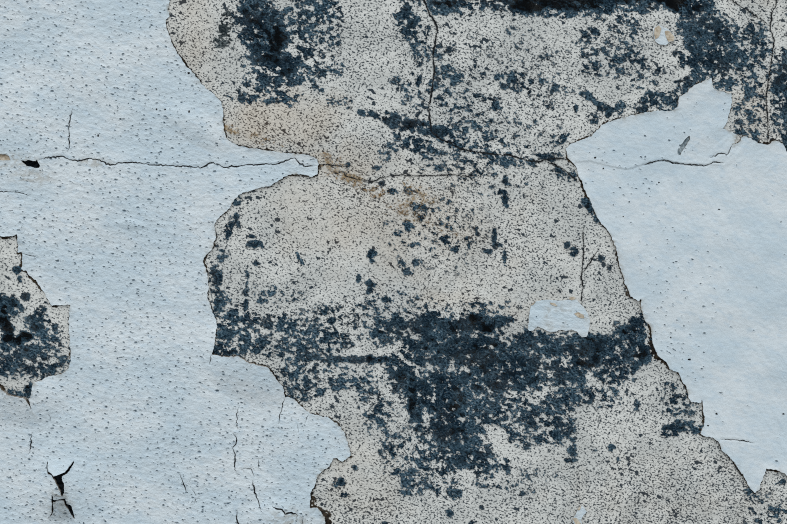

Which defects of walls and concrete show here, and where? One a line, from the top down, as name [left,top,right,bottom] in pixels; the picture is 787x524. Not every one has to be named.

crack [44,113,473,182]
damp [212,0,787,209]
crack [423,0,577,181]
crack [645,144,733,166]
peeling [0,234,71,403]
damp [0,266,71,398]
damp [208,181,653,519]
peeling [166,0,787,524]
damp [659,381,704,439]